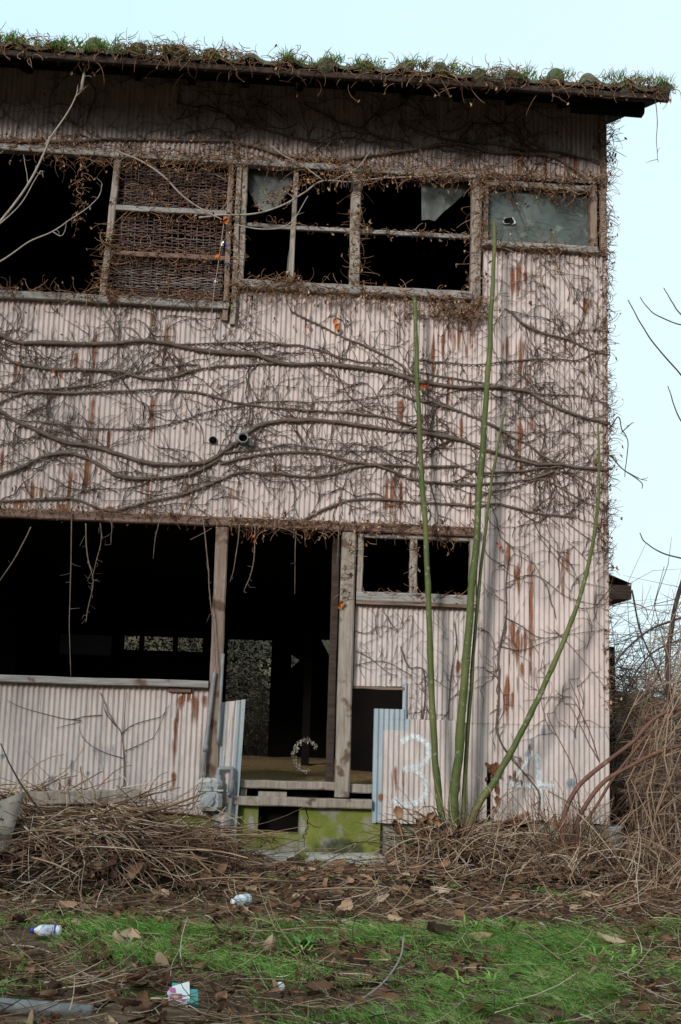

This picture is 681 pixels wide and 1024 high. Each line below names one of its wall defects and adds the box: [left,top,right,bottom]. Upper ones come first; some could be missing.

rust [510,265,527,295]
rust [90,398,110,448]
rust [383,478,403,515]
rust [504,546,534,715]
rust [173,692,207,755]
rust [485,744,532,813]
leakage [321,840,362,853]